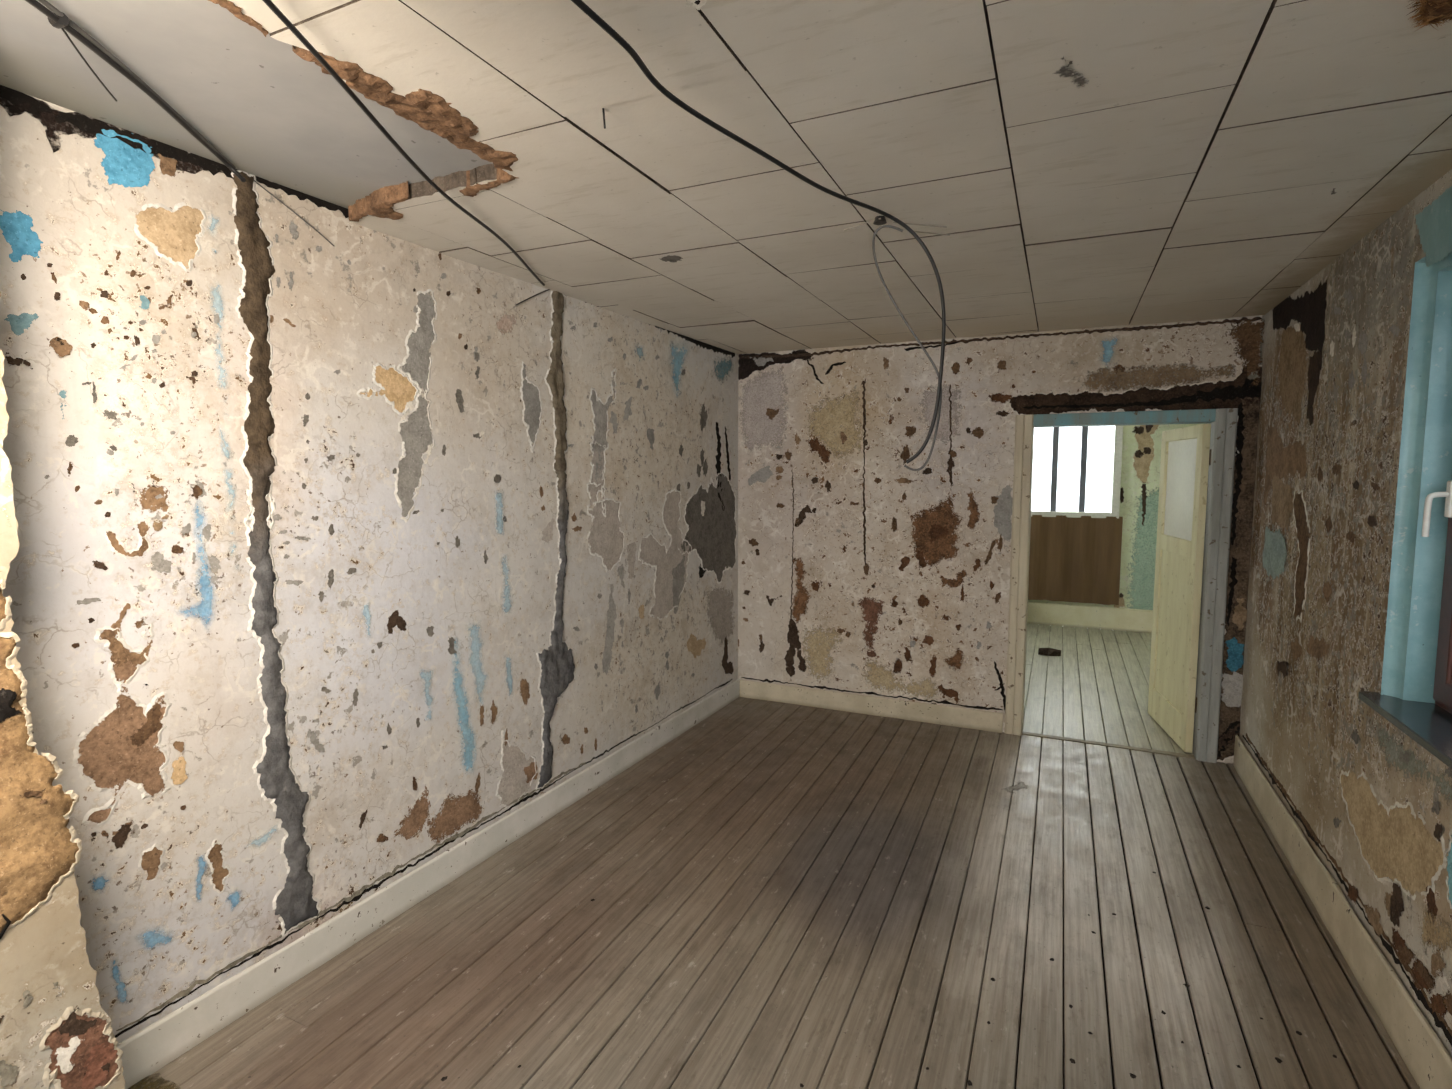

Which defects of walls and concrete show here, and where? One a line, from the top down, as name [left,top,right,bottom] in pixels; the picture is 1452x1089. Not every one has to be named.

peeling [82,382,117,420]
flaking render [392,253,451,522]
flaking render [455,389,465,413]
peeling [458,333,480,379]
flaking render [520,361,542,453]
peeling [65,435,80,492]
flaking render [539,322,868,675]
peeling [874,426,932,500]
spalling [0,579,188,939]
crack [115,470,1006,1038]
flaking render [0,1060,19,1087]
flaking render [39,1006,123,1089]